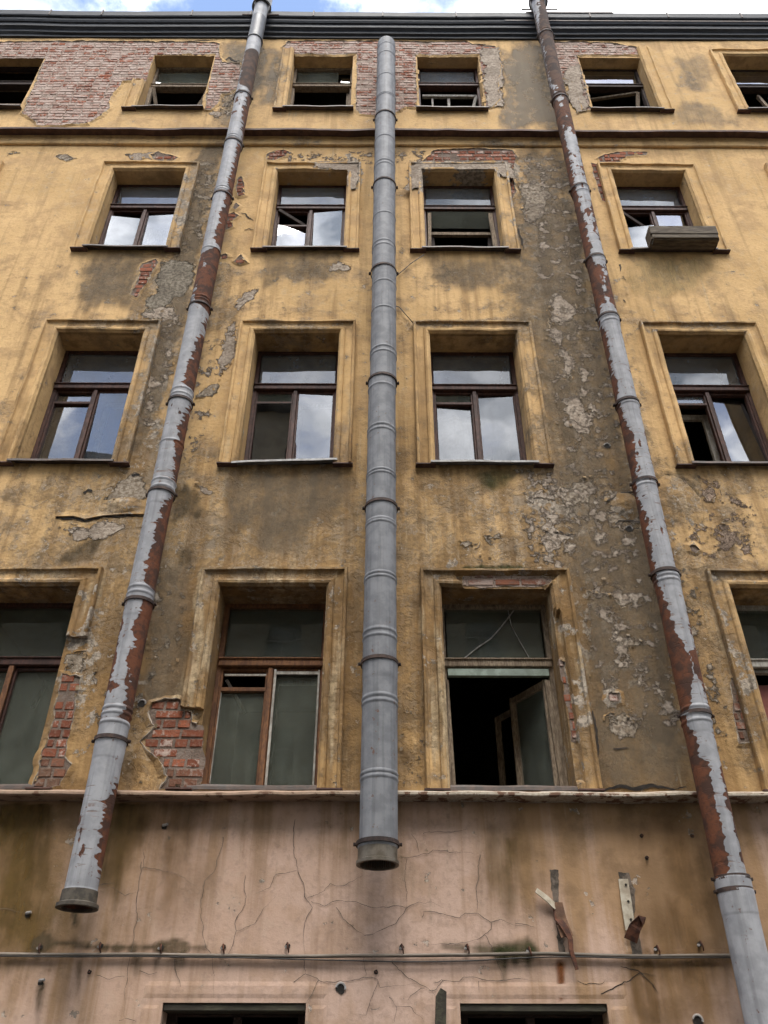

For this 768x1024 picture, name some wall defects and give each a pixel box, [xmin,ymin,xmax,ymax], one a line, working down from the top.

flaking render [0,40,242,127]
damp [499,42,557,129]
flaking render [554,41,639,113]
flaking render [104,472,147,500]
flaking render [395,147,680,744]
flaking render [58,519,125,541]
flaking render [665,475,761,749]
flaking render [28,649,106,790]
flaking render [132,692,206,791]
crack [98,821,534,1019]
crack [577,966,659,994]